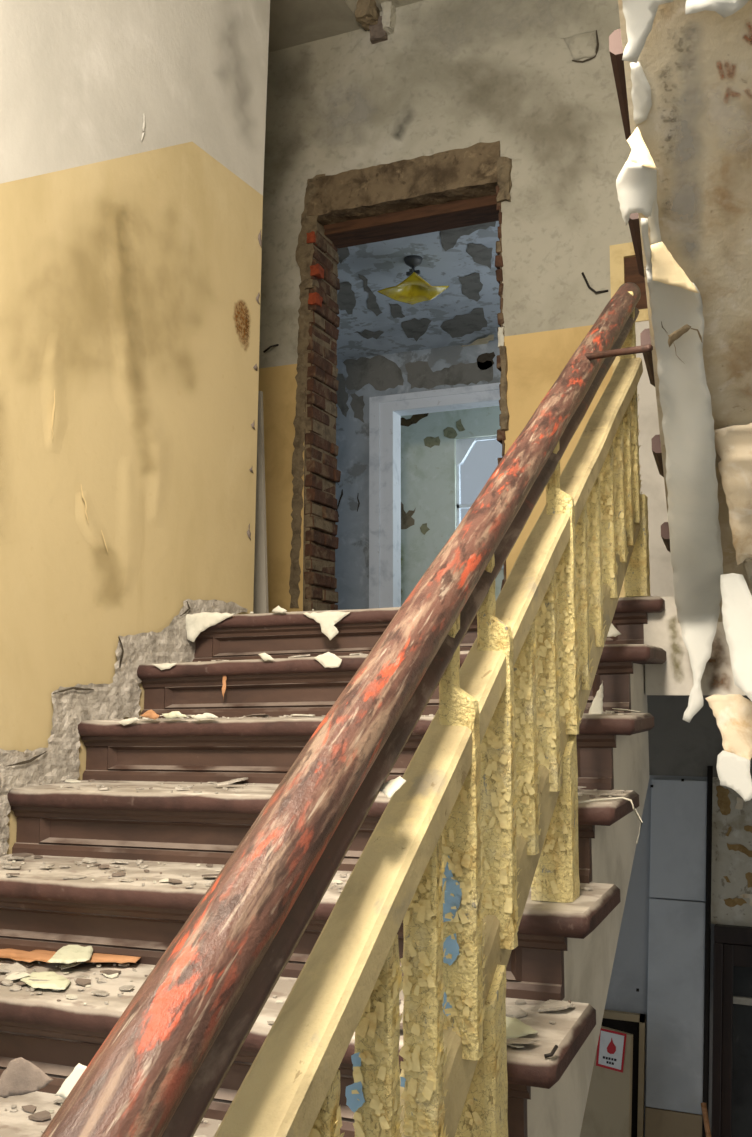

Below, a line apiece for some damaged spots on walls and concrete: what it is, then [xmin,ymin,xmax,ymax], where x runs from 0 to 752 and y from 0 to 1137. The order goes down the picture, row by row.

flaking render [496,156,512,203]
flaking render [272,174,350,668]
peeling [336,221,510,431]
peeling [616,0,752,857]
flaking render [0,599,247,857]
peeling [724,872,752,907]